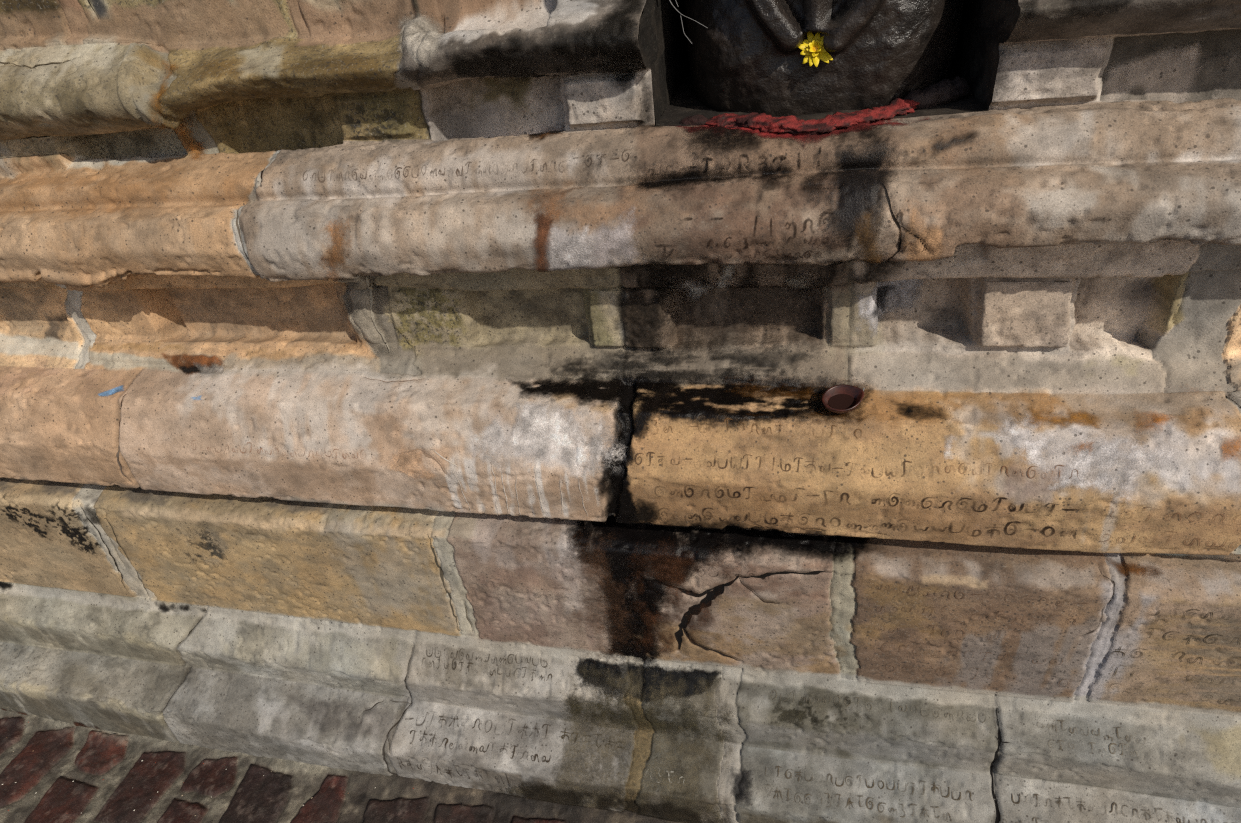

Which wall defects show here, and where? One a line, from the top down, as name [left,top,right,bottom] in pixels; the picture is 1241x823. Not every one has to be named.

water stain [607,0,645,87]
water stain [728,119,906,142]
water stain [933,133,976,150]
water stain [639,164,792,188]
water stain [838,151,886,247]
water stain [552,286,818,438]
water stain [599,468,612,495]
water stain [2,503,99,554]
water stain [635,501,658,523]
crack [667,571,826,661]
water stain [778,701,851,725]
crack [991,708,1009,823]